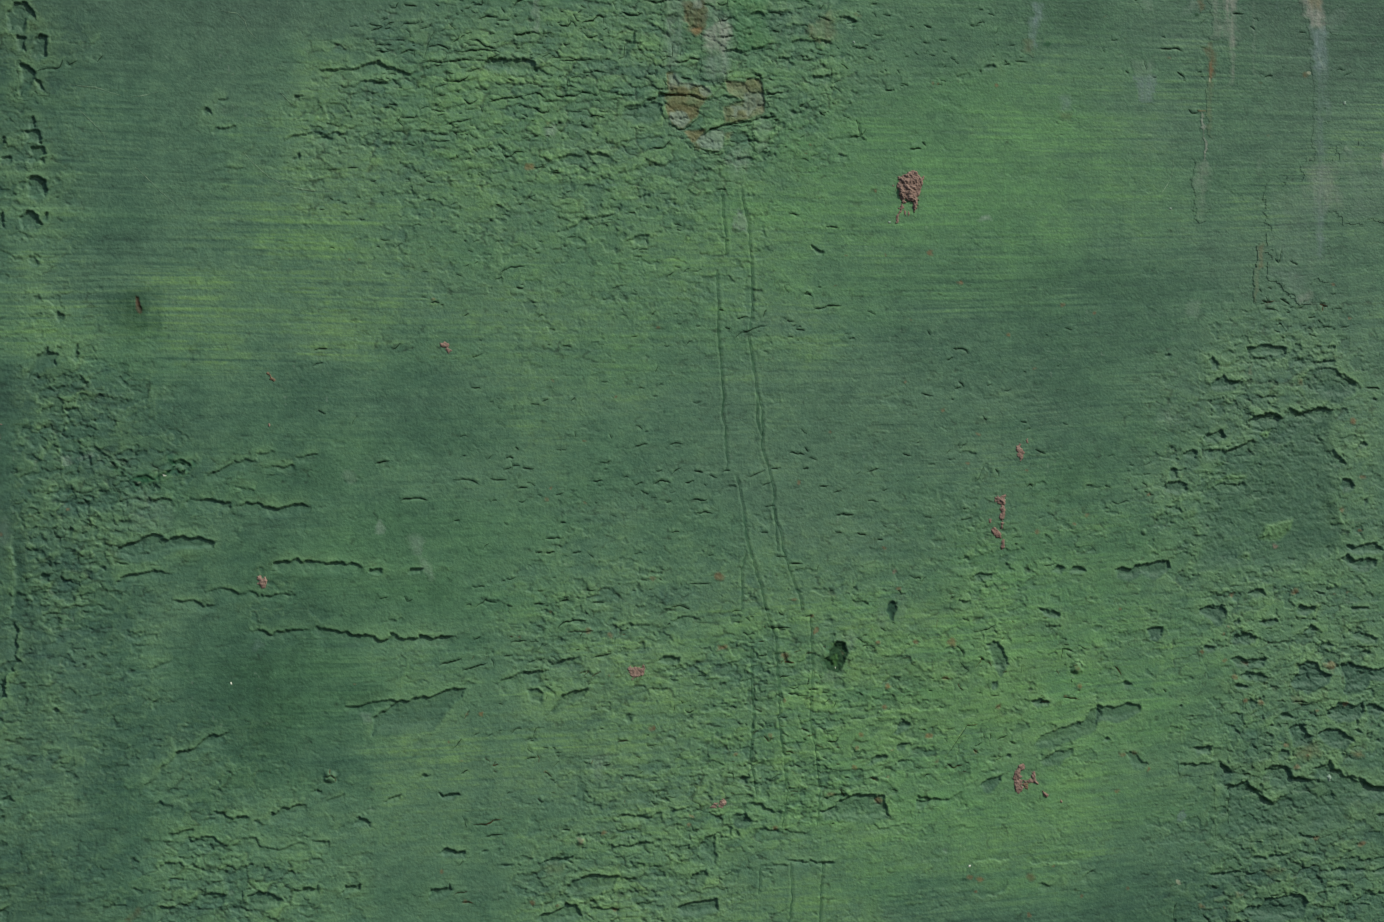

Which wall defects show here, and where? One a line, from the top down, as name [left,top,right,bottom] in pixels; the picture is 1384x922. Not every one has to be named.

peeling [0,0,85,384]
peeling [618,0,860,155]
water stain [1207,0,1257,87]
water stain [1255,0,1384,305]
crack [321,0,1085,837]
peeling [0,514,425,710]
peeling [313,613,460,659]
peeling [494,651,594,719]
peeling [820,638,852,676]
peeling [1113,339,1384,922]
crack [758,864,824,922]
peeling [534,676,1154,922]